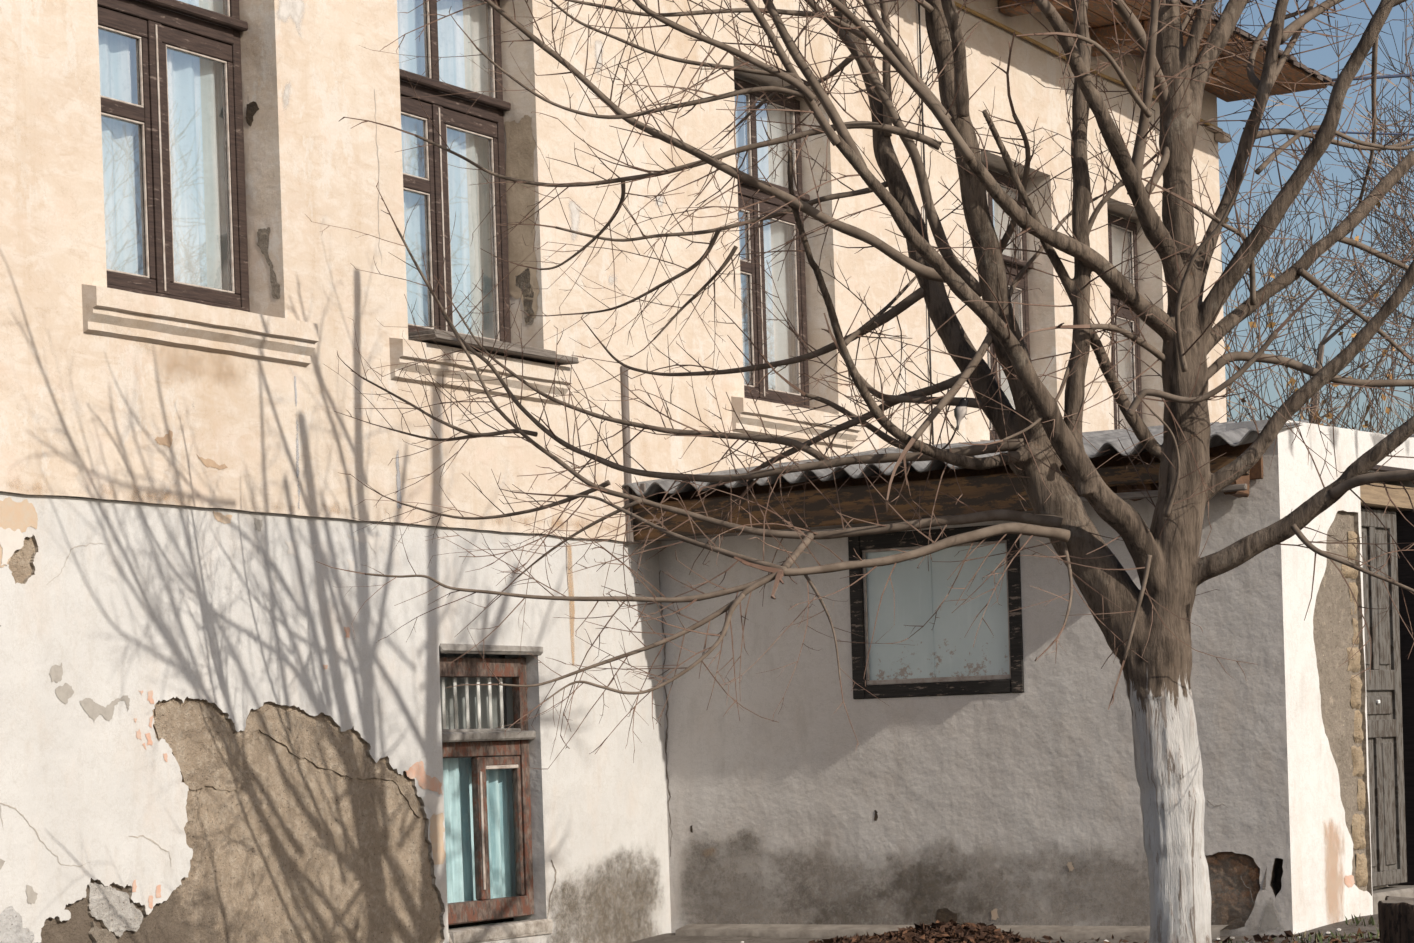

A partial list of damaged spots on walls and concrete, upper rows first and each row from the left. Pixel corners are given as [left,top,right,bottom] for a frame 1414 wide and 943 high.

spalling [245,101,259,127]
spalling [257,227,280,299]
peeling [0,497,38,584]
spalling [1313,510,1372,896]
crack [0,803,89,867]
spalling [37,663,446,943]
peeling [26,885,38,904]
water stain [555,861,659,943]
water stain [685,832,1150,926]
water stain [1209,874,1241,934]
spalling [1205,852,1283,931]